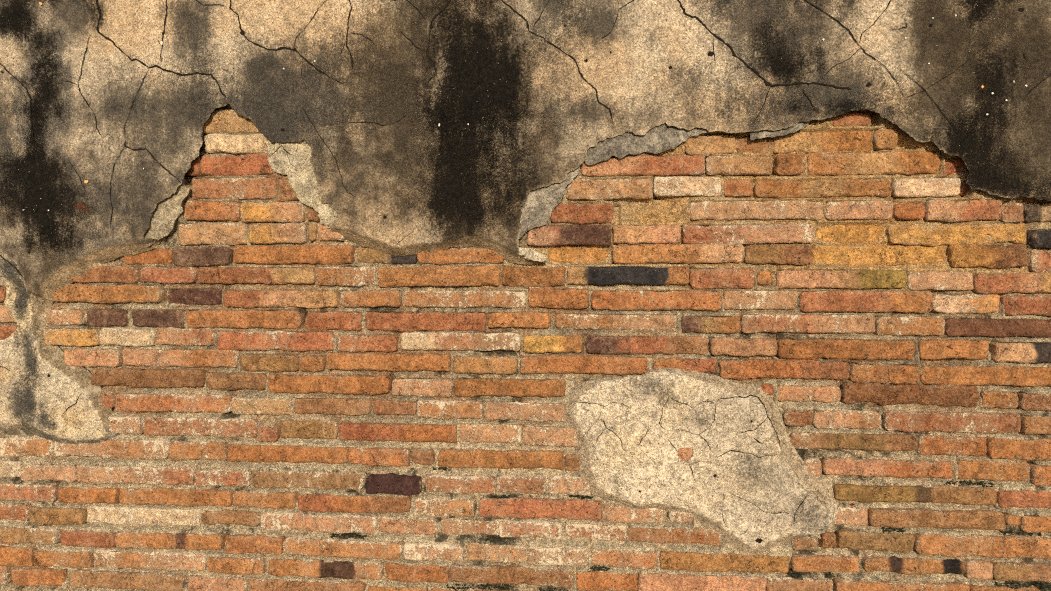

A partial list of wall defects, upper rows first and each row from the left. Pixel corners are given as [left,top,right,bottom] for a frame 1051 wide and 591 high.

leakage [0,0,89,251]
crack [62,0,227,228]
crack [197,0,373,84]
spalling [267,138,337,228]
leakage [83,0,539,239]
leakage [534,0,624,51]
spalling [519,122,709,264]
crack [678,0,994,133]
leakage [712,0,1051,199]
spalling [812,202,1051,269]
crack [578,389,781,478]
spalling [840,382,1018,409]